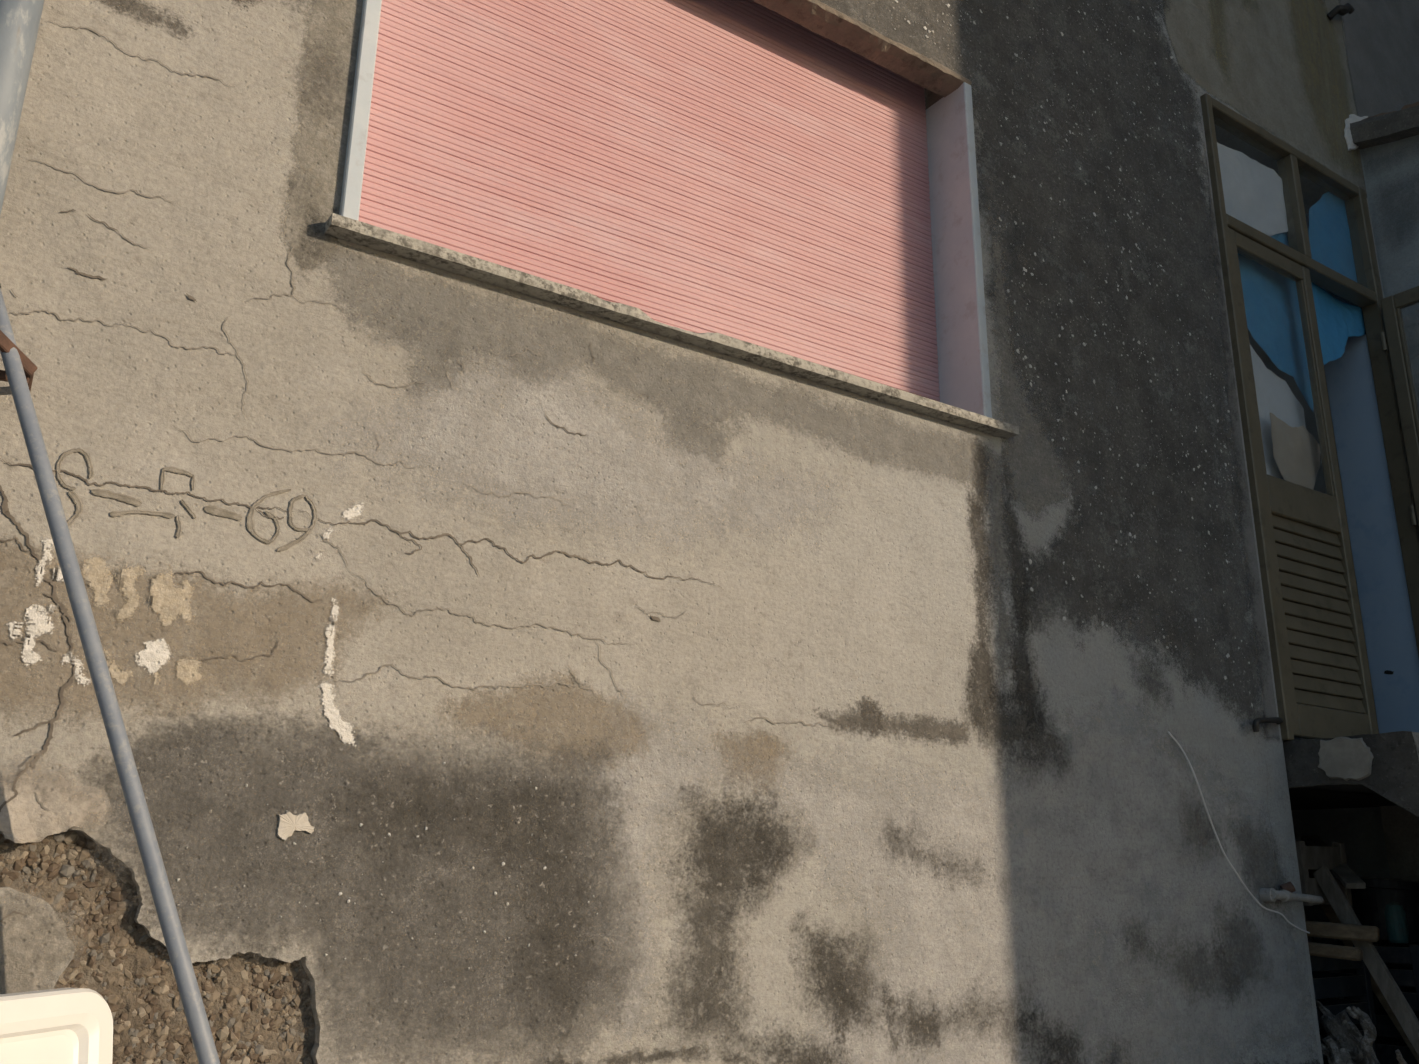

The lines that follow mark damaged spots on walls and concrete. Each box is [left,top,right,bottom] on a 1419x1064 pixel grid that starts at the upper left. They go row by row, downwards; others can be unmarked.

crack [31,159,173,248]
damp [0,548,98,721]
peeling [114,565,194,627]
crack [9,245,421,468]
crack [0,458,719,783]
crack [545,411,589,436]
damp [300,218,1067,777]
spalling [0,754,199,1064]
spalling [192,952,315,1064]
spalling [277,811,314,841]
damp [81,570,645,1064]
damp [671,801,832,1064]